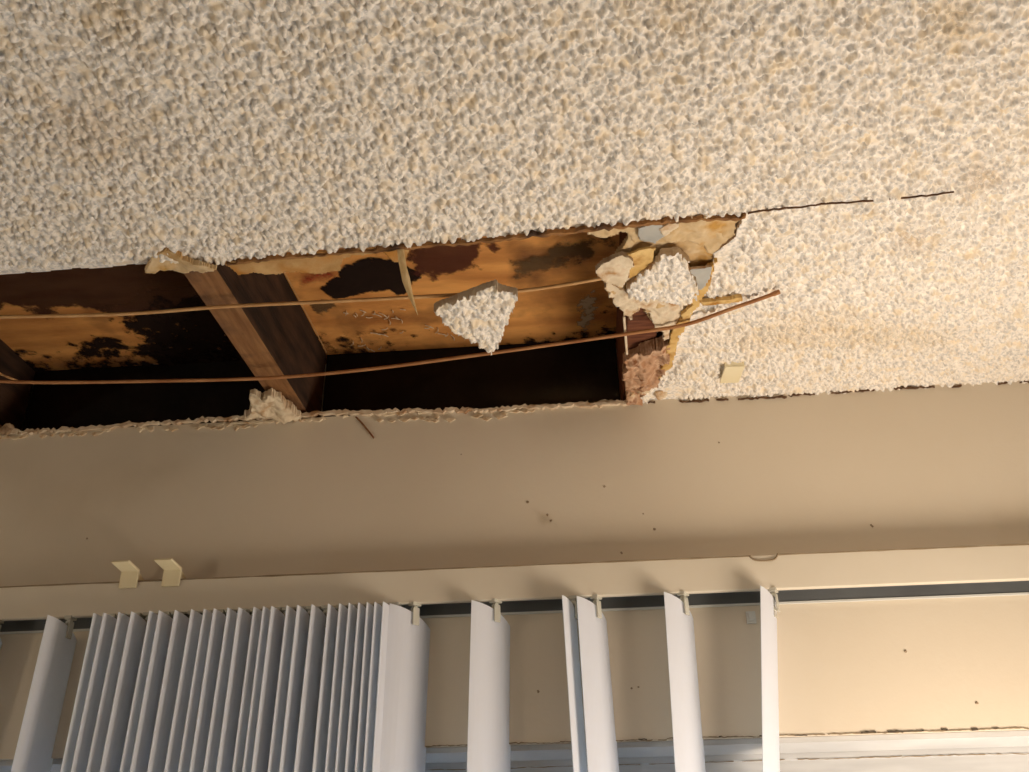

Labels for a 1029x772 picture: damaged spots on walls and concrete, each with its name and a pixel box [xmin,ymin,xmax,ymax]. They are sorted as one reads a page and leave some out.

crack [748,191,954,214]
peeling [659,223,679,236]
leakage [310,238,500,314]
leakage [510,238,615,279]
peeling [595,251,634,288]
leakage [0,264,244,381]
leakage [317,329,399,355]
leakage [524,306,616,345]
spalling [298,336,670,423]
spalling [0,415,279,440]